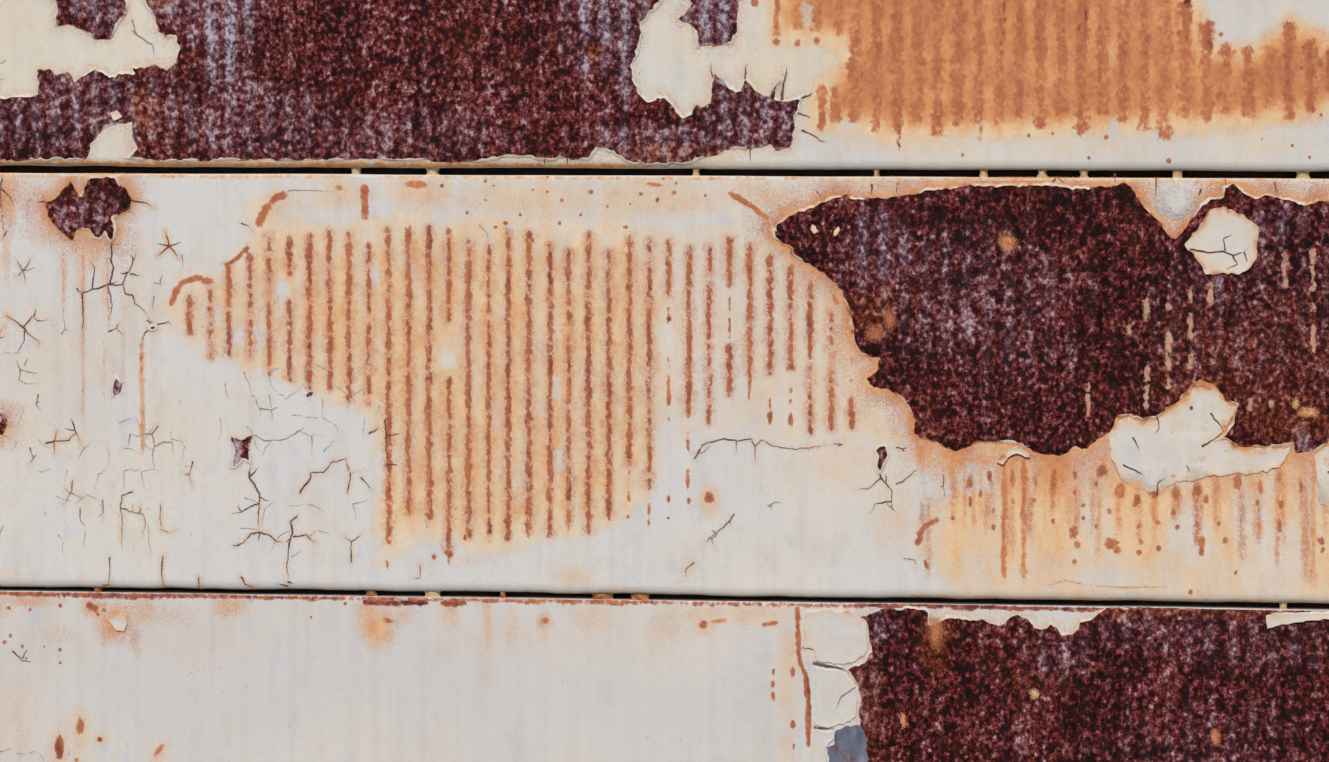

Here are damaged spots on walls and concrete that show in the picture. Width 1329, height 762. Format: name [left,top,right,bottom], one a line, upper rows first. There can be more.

peeling [0,0,805,266]
rust [750,0,1329,157]
crack [0,178,204,589]
crack [220,365,404,589]
rust [0,158,1329,762]
crack [681,501,781,584]
crack [688,434,848,467]
crack [853,446,949,519]
peeling [742,176,1329,505]
crack [802,647,856,729]
peeling [804,605,1329,762]